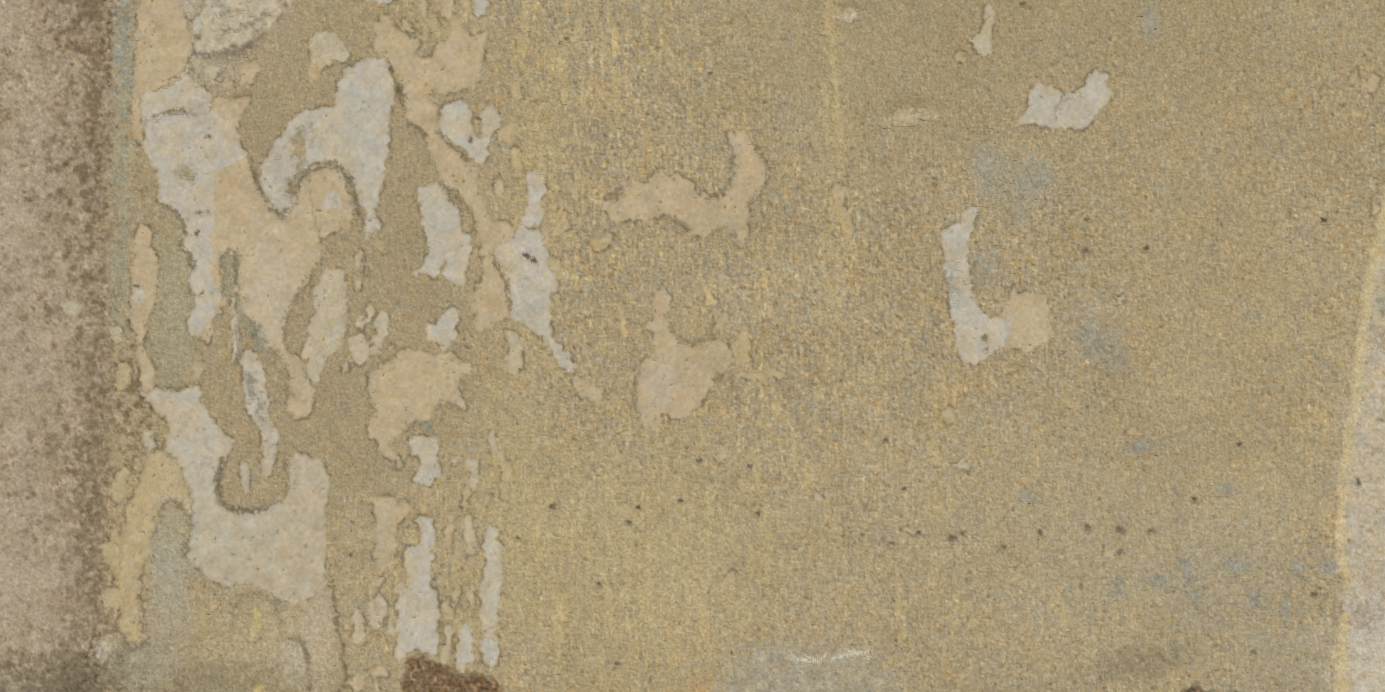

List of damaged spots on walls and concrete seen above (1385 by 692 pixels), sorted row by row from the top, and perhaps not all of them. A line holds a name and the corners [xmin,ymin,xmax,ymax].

peeling [1017,69,1115,130]
peeling [588,129,766,252]
peeling [101,0,604,692]
peeling [637,282,787,431]
peeling [940,206,1053,366]
spalling [944,530,968,545]